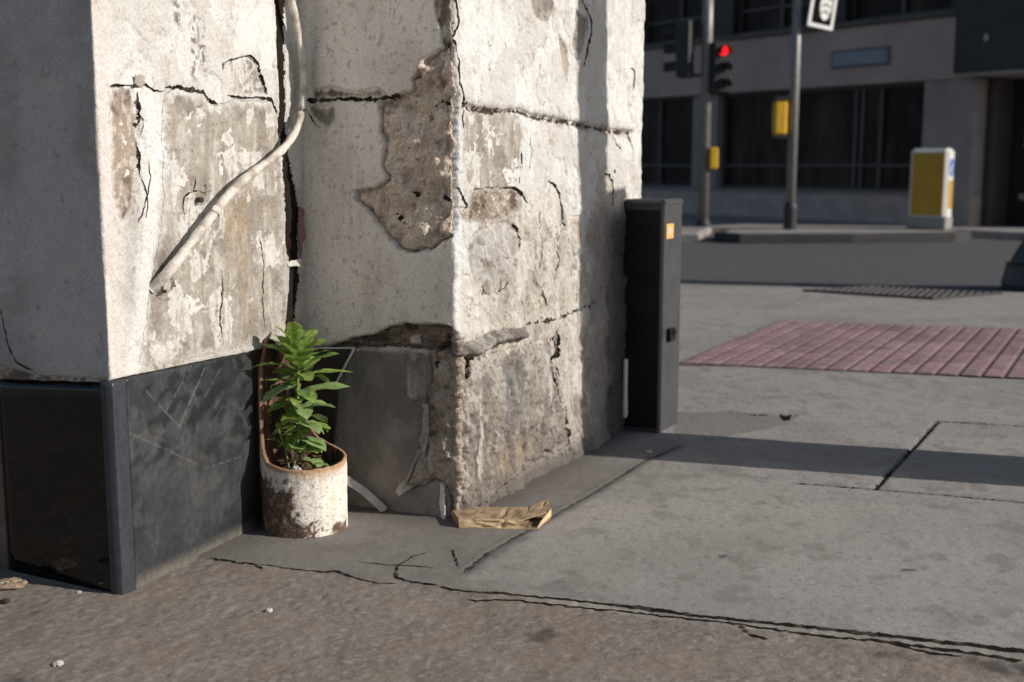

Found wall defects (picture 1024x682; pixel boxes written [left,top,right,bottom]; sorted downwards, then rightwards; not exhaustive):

crack [111,0,405,335]
spalling [307,0,528,295]
crack [452,0,634,205]
crack [0,310,35,373]
spalling [335,322,567,519]
crack [499,181,596,453]
crack [551,447,678,518]
crack [214,530,1024,662]